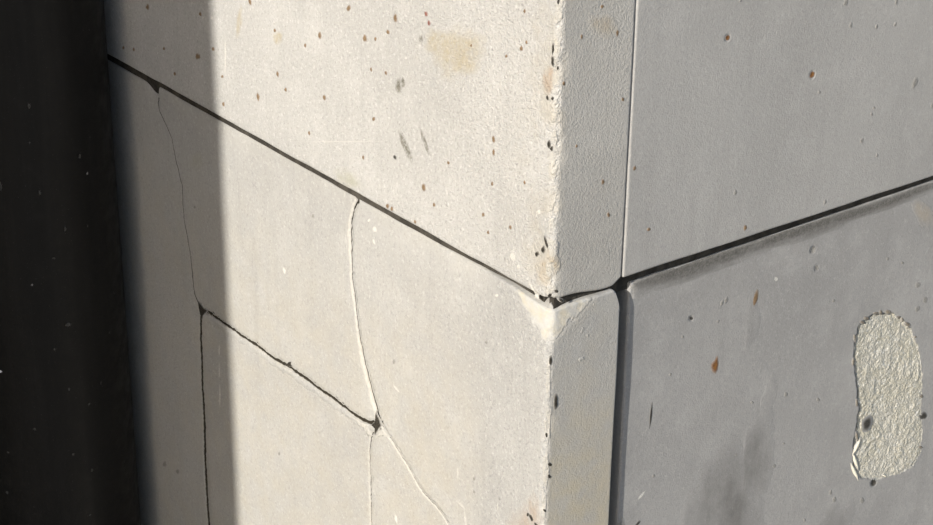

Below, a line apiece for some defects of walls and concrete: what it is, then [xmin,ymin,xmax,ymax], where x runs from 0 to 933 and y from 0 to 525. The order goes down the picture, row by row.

crack [158,97,450,525]
peeling [850,309,933,487]